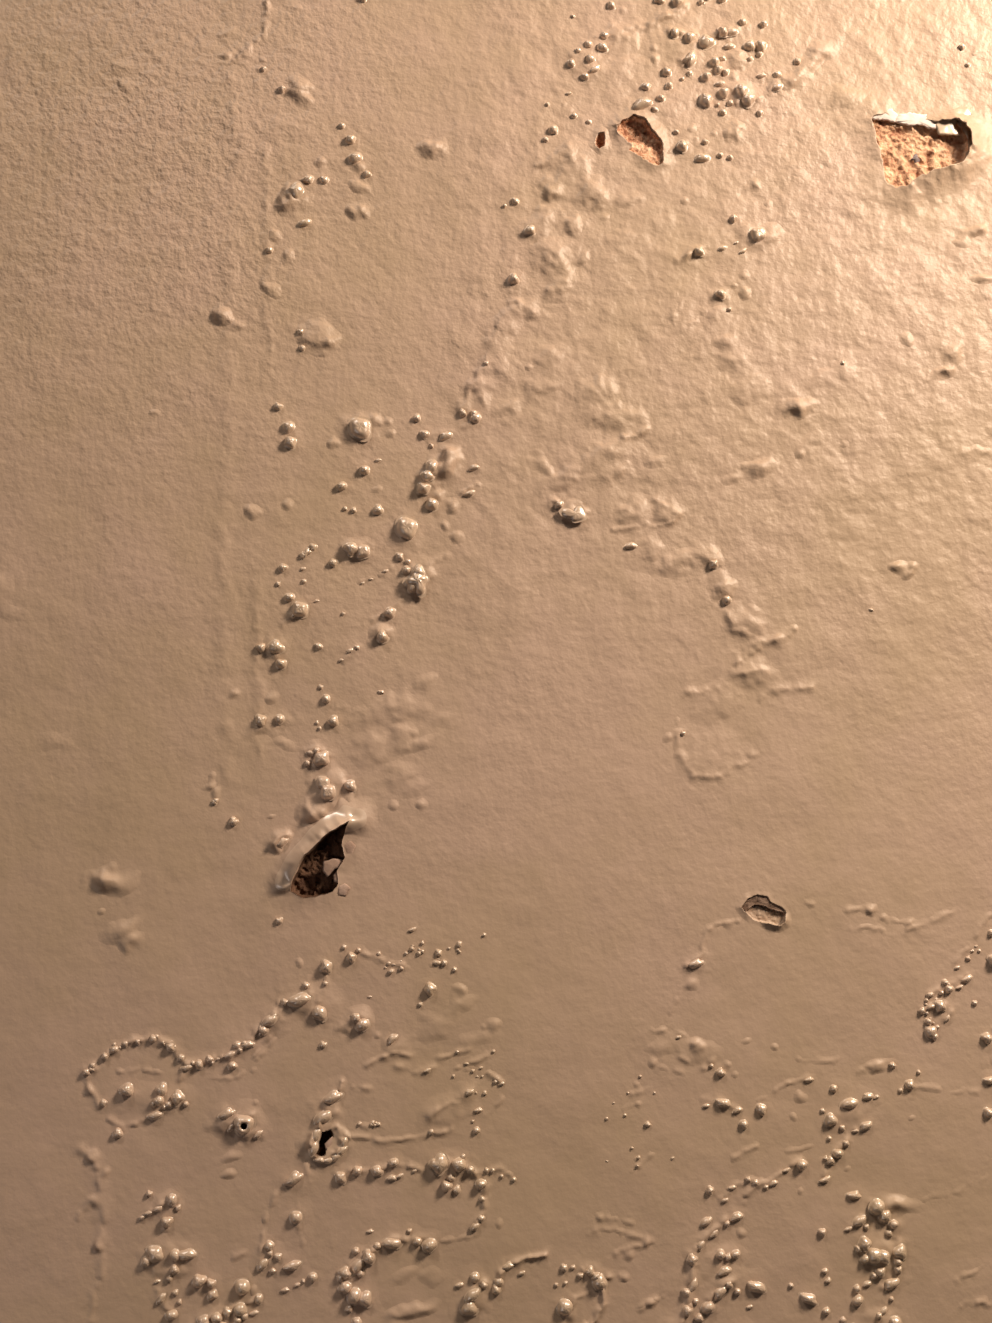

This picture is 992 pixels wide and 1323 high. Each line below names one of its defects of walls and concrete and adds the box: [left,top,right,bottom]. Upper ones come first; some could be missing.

spalling [588,106,676,177]
spalling [841,90,992,220]
spalling [735,890,792,933]